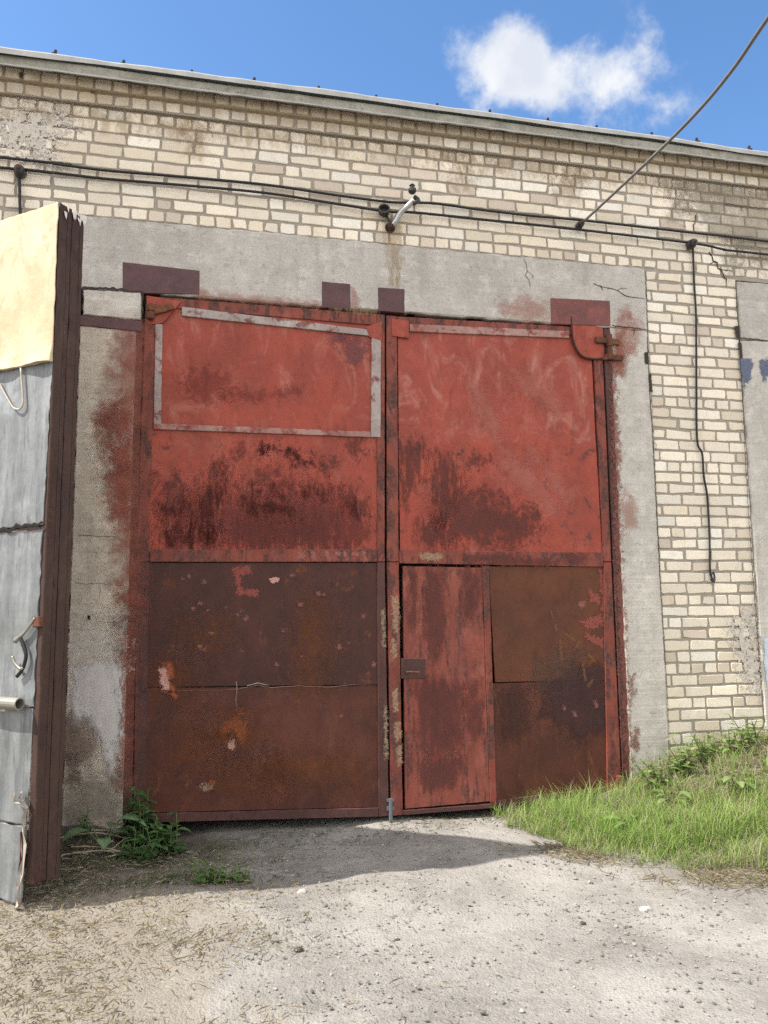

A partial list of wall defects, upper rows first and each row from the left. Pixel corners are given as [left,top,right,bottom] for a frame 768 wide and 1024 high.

rust [99,329,370,790]
peeling [232,565,259,597]
rust [398,438,541,552]
crack [594,272,671,749]
crack [709,252,768,722]
damp [68,657,127,778]
peeling [159,661,178,699]